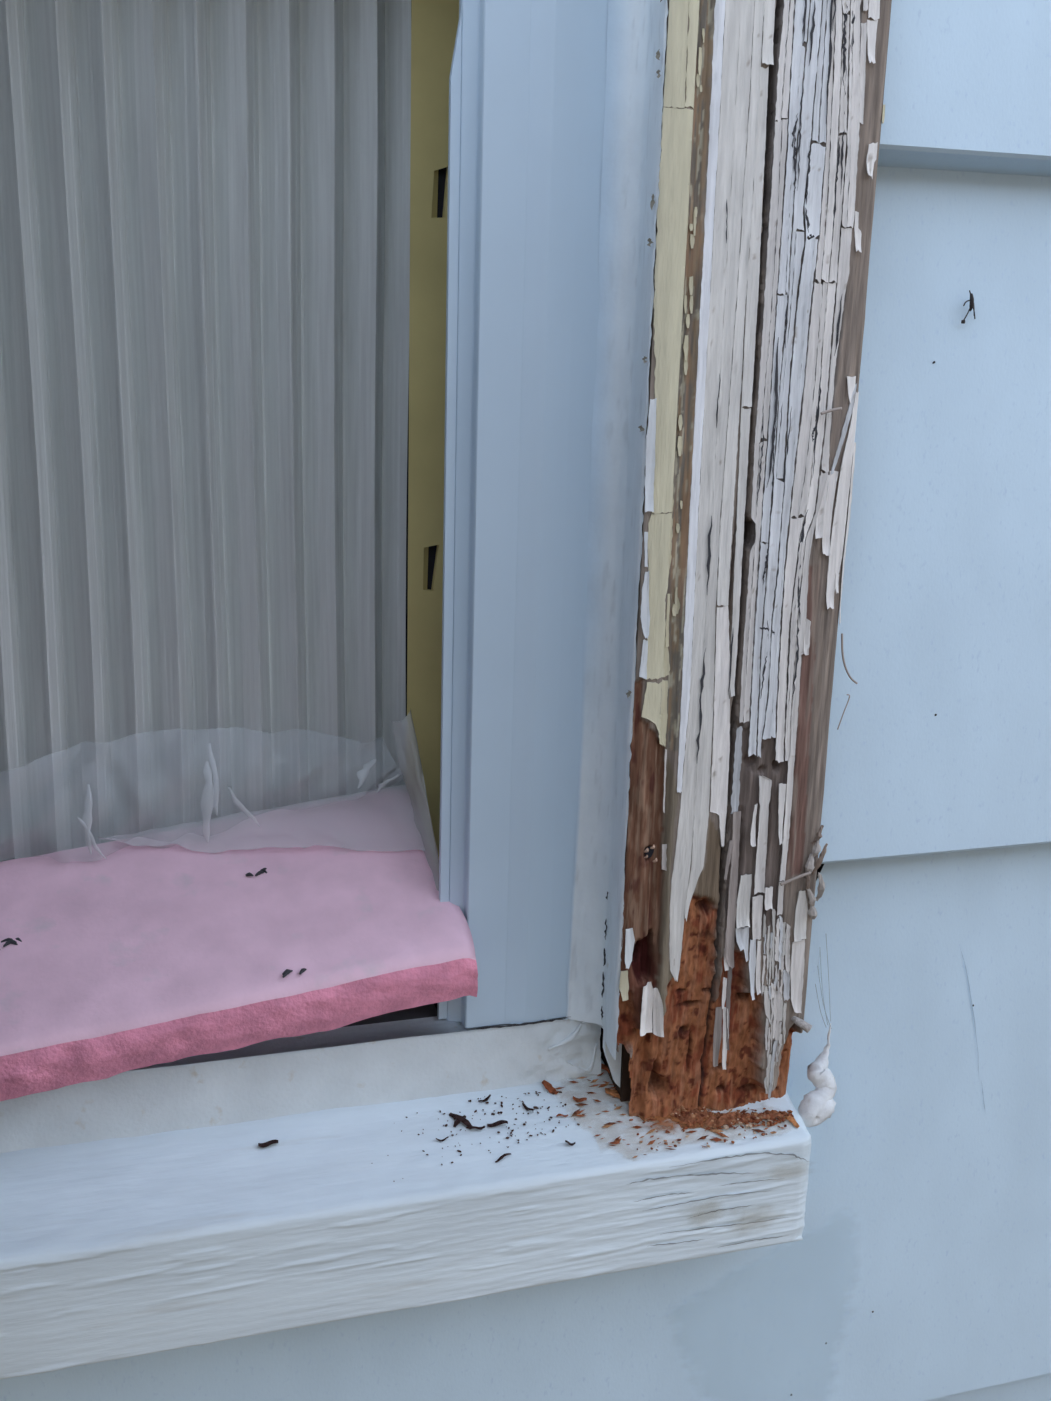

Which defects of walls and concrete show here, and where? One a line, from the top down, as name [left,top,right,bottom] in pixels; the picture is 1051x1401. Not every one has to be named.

peeling [619,928,664,1037]
peeling [626,0,880,1100]